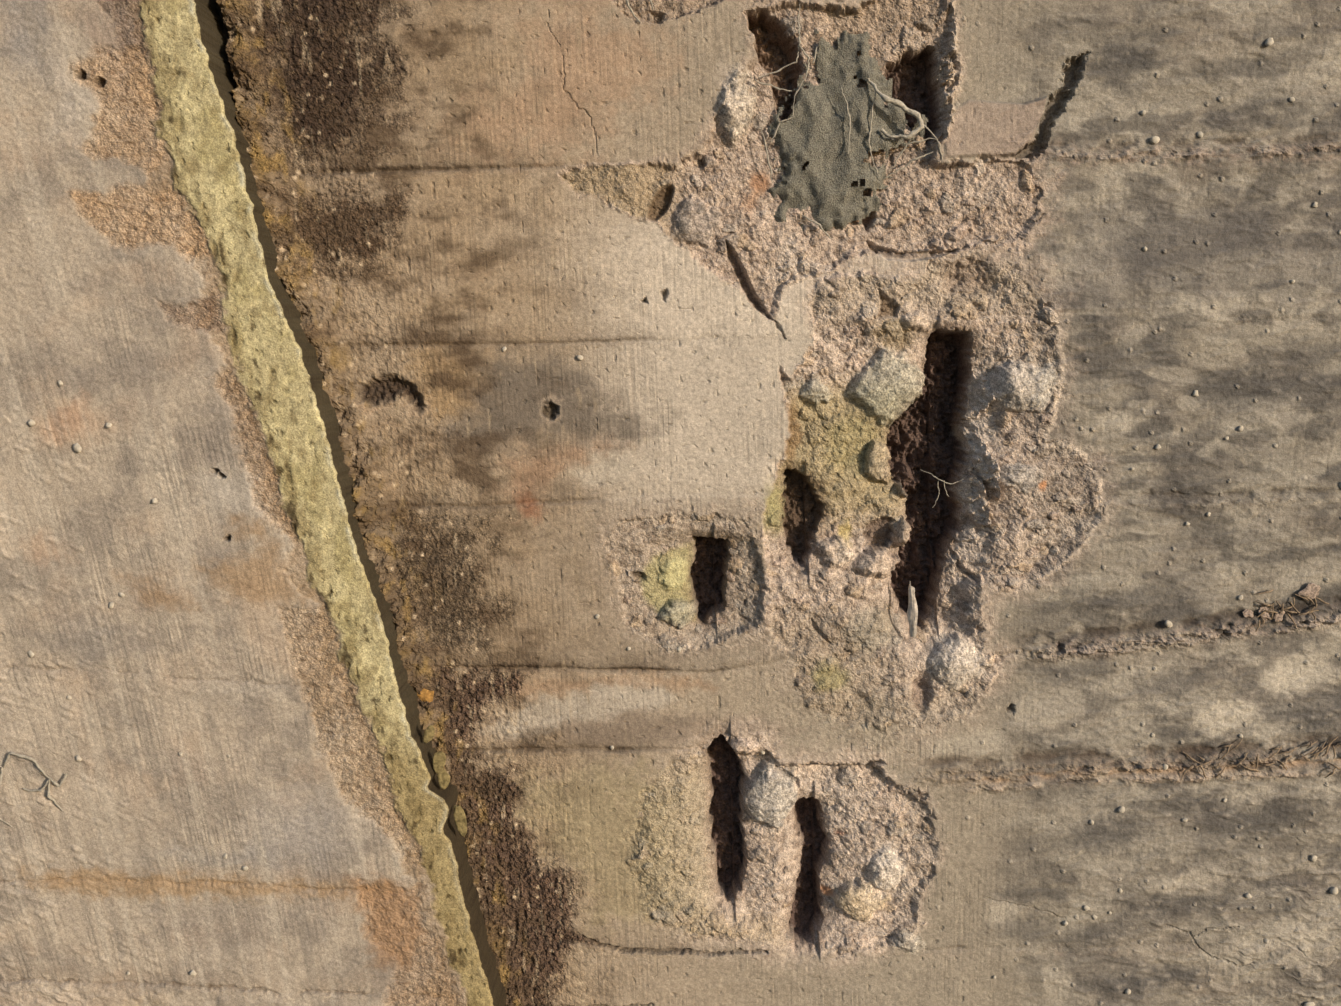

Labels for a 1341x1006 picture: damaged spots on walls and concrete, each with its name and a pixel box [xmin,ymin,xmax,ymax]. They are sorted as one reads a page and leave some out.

leakage [220,0,420,292]
leakage [433,343,683,490]
spalling [557,0,1106,735]
leakage [364,502,808,1006]
spalling [626,732,943,958]